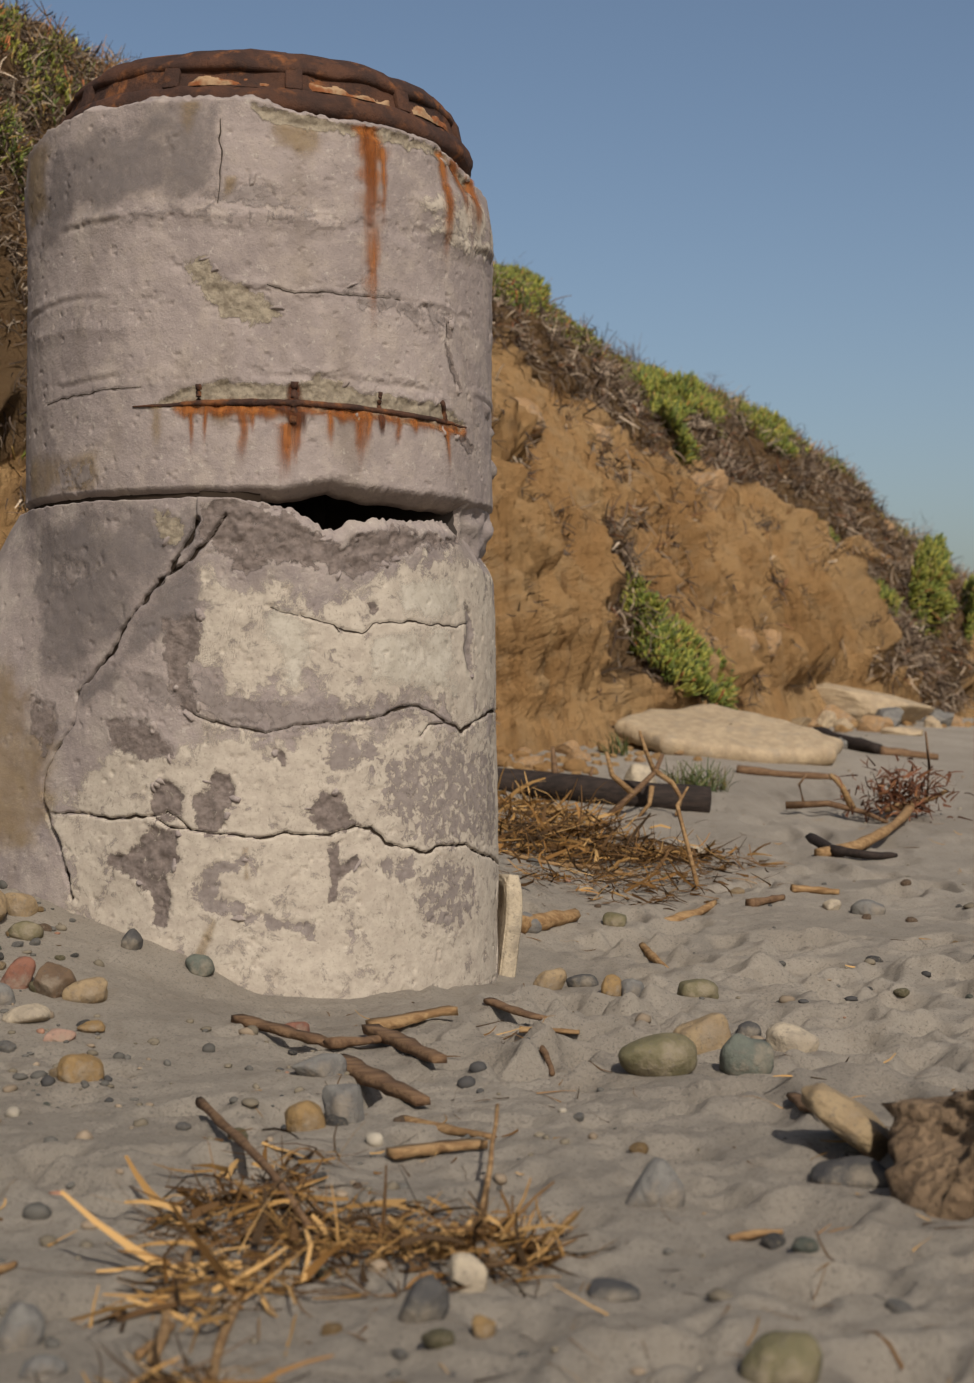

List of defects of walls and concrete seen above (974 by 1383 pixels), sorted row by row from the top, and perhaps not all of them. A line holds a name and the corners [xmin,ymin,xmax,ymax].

corrosion [354,125,386,213]
corrosion [435,152,481,229]
crack [267,284,401,301]
corrosion [369,239,377,281]
crack [48,387,140,405]
corrosion [132,381,467,459]
crack [33,491,260,776]
crack [270,607,466,634]
peeling [44,498,499,999]
crack [193,705,494,736]
crack [57,811,496,898]